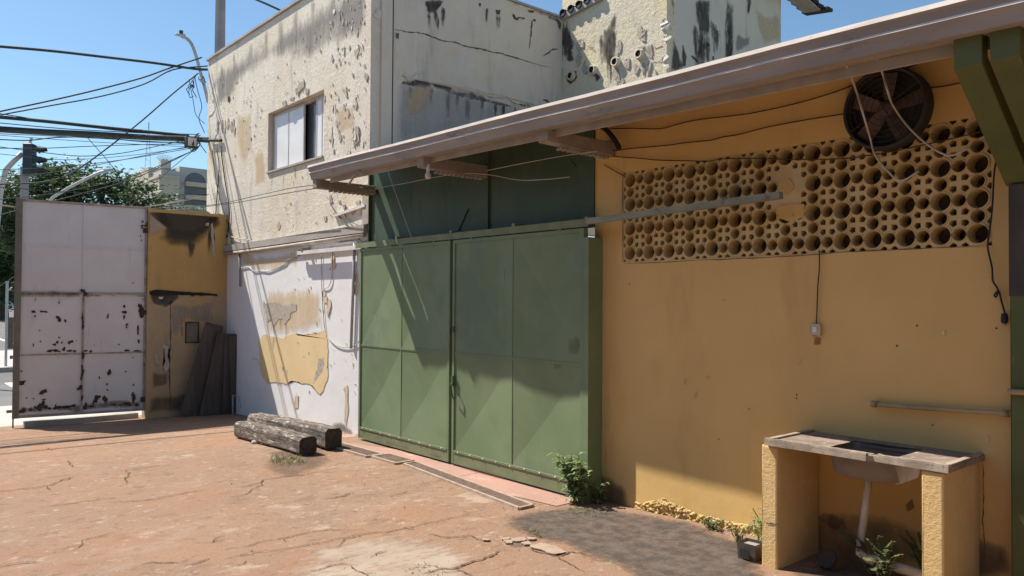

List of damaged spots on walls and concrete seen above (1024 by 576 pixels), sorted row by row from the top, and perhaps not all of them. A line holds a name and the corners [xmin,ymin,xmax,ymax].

peeling [214,70,262,156]
peeling [294,0,382,159]
leakage [425,0,445,26]
crack [394,21,557,69]
leakage [589,16,616,81]
leakage [672,1,749,70]
leakage [152,212,217,253]
corrosion [21,289,99,323]
corrosion [19,313,139,413]
corrosion [118,299,144,358]
peeling [258,277,334,409]
peeling [343,343,356,425]